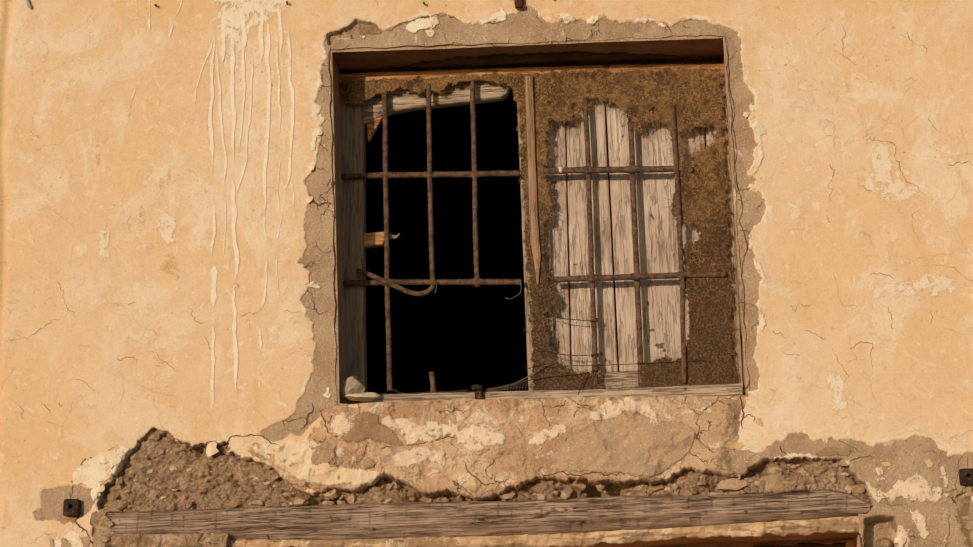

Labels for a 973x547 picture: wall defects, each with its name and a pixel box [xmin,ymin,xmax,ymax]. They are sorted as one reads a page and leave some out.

leakage [194,0,296,400]
flaking render [261,6,768,441]
peeling [867,142,923,204]
peeling [872,272,965,300]
spalling [33,445,230,547]
peeling [206,441,219,457]
crack [538,470,637,478]
flaking render [748,431,973,547]